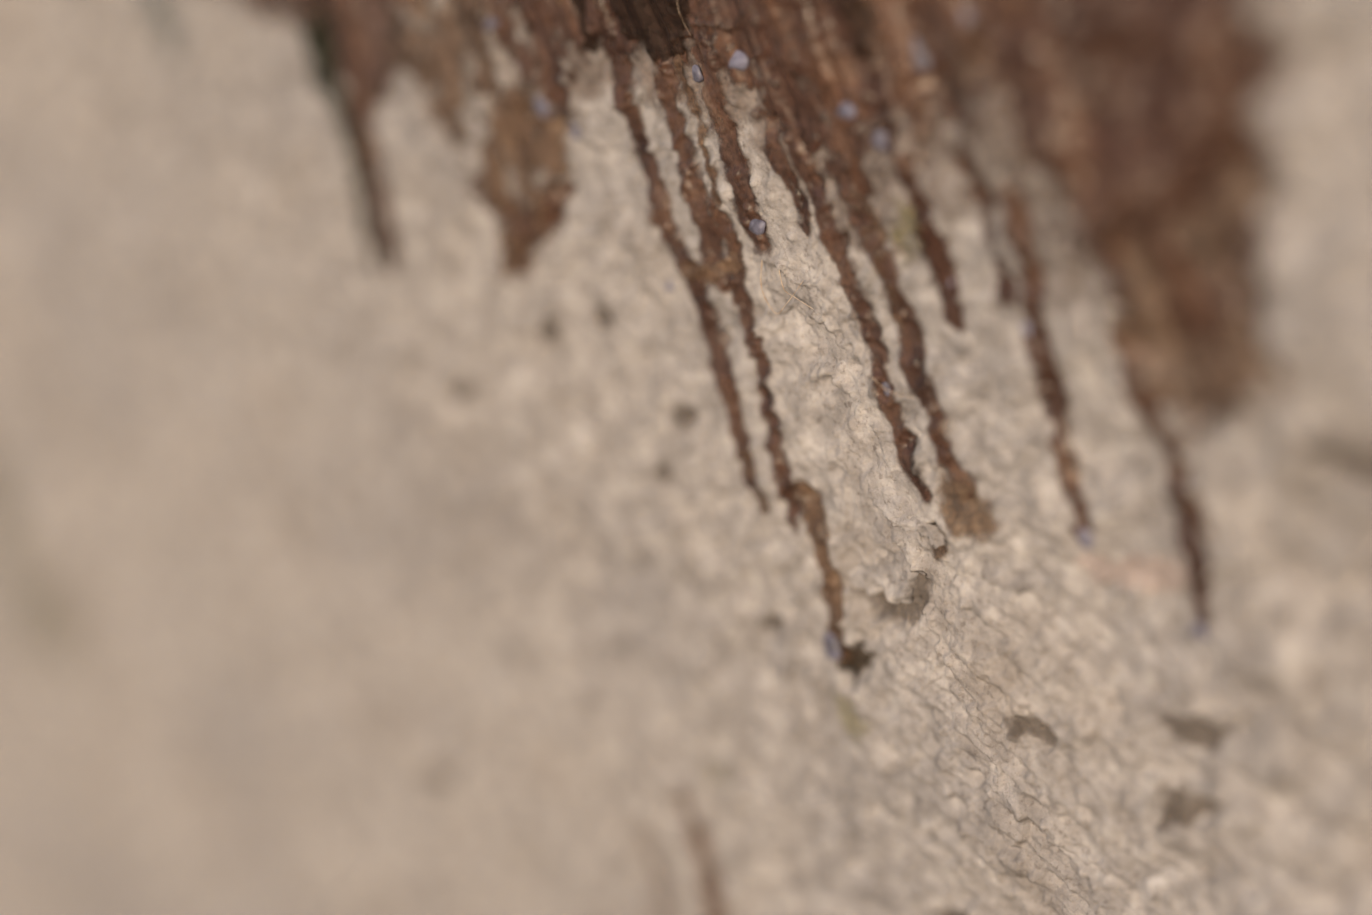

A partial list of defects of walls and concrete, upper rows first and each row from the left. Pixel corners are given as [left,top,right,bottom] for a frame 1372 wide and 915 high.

rust [933,475,996,560]